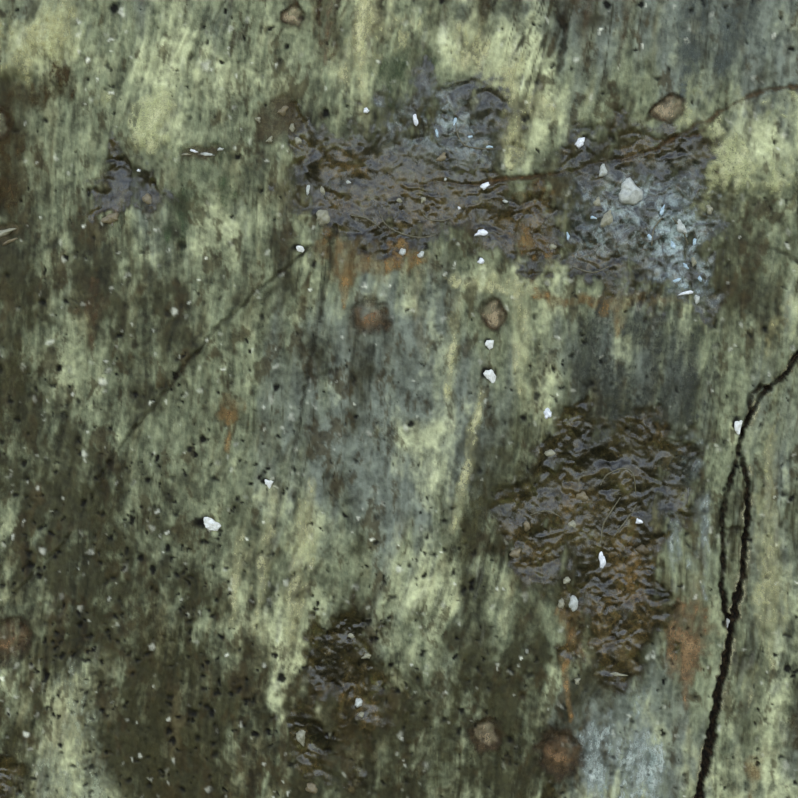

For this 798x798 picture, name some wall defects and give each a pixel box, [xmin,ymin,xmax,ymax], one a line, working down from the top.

spalling [87,132,173,225]
spalling [255,55,729,324]
crack [483,174,541,183]
crack [655,85,798,150]
spalling [491,395,703,693]
crack [693,351,798,798]